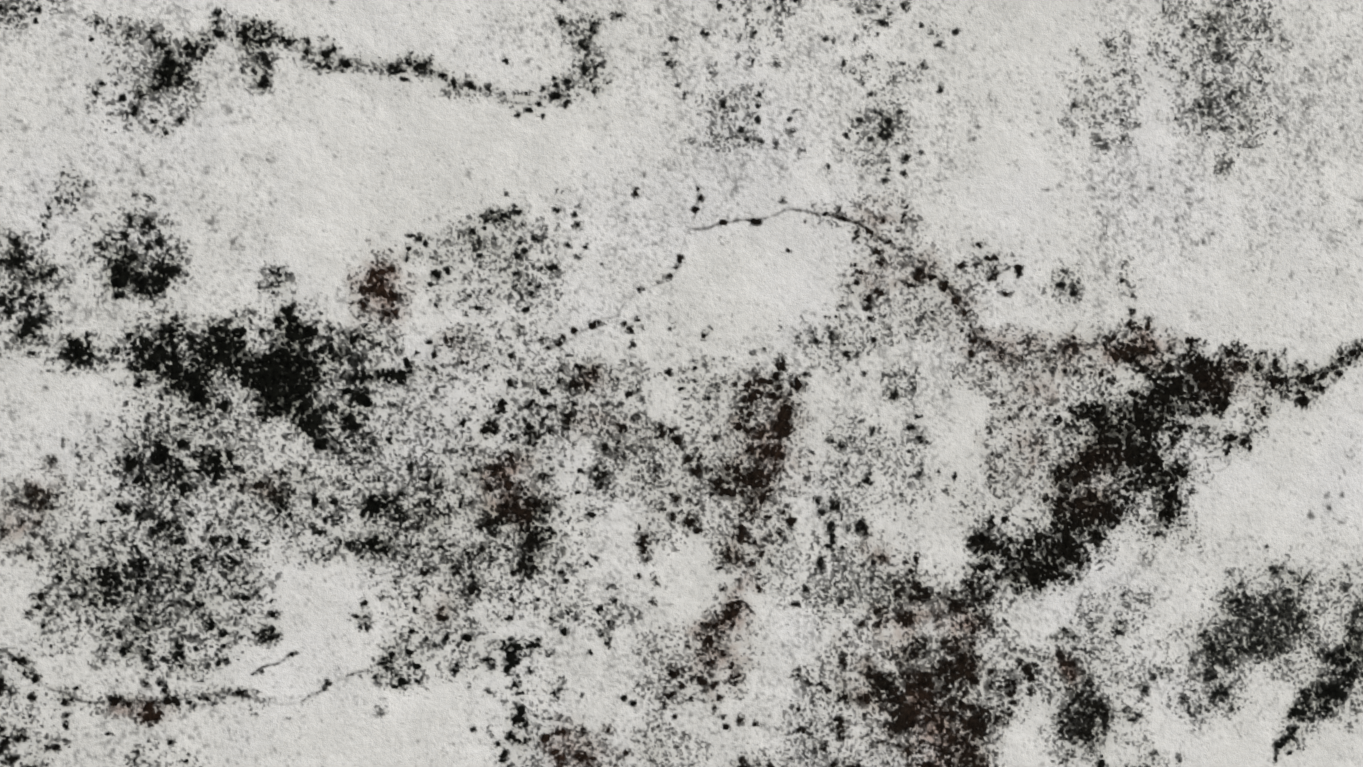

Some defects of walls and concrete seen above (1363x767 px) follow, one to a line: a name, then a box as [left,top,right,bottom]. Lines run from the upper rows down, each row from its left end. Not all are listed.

crack [539,254,684,350]
crack [692,187,1024,360]
crack [1050,343,1084,358]
water stain [0,172,1363,767]
crack [25,592,61,616]
crack [0,649,294,735]
crack [323,674,361,691]